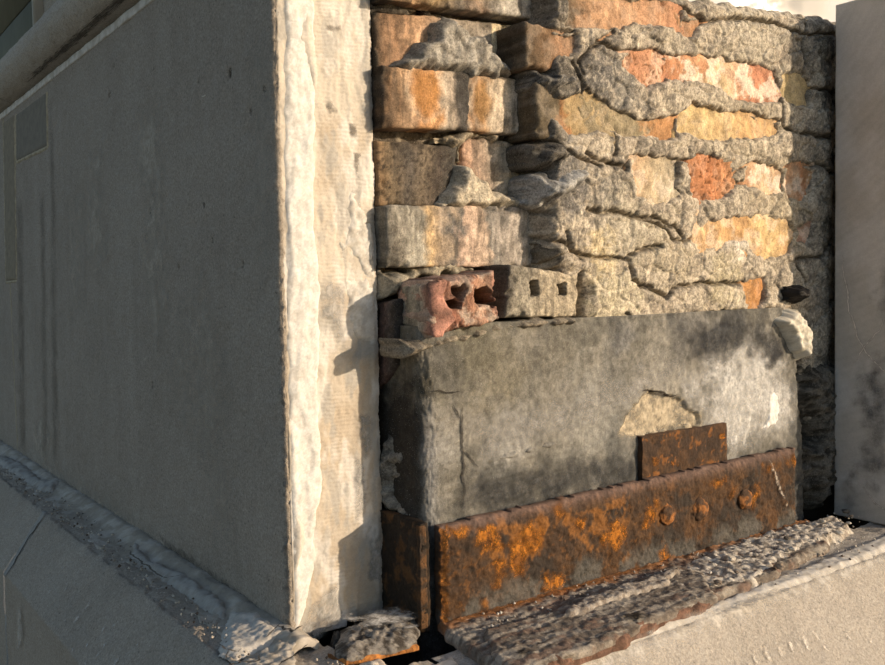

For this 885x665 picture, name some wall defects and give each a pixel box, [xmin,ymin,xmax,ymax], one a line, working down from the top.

spalling [397,265,577,338]
crack [432,390,478,506]
spalling [619,391,702,436]
damp [685,349,791,444]
peeling [748,390,779,429]
corrosion [602,521,626,549]
corrosion [416,525,428,633]
corrosion [439,524,606,622]
corrosion [484,550,718,665]
spalling [224,640,296,665]
corrosion [328,644,419,665]